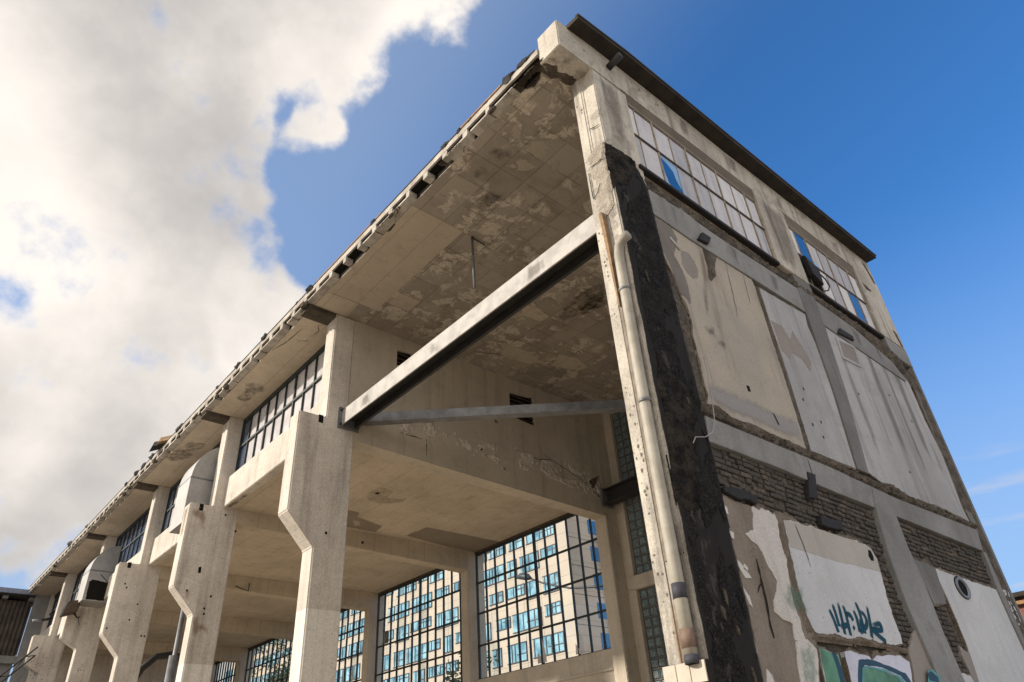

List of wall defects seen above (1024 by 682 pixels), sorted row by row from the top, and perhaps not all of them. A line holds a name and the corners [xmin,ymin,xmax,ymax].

spalling [508,59,576,96]
spalling [588,140,614,217]
flaking render [655,218,716,404]
spalling [902,368,976,517]
crack [756,559,775,638]
peeling [730,506,819,682]